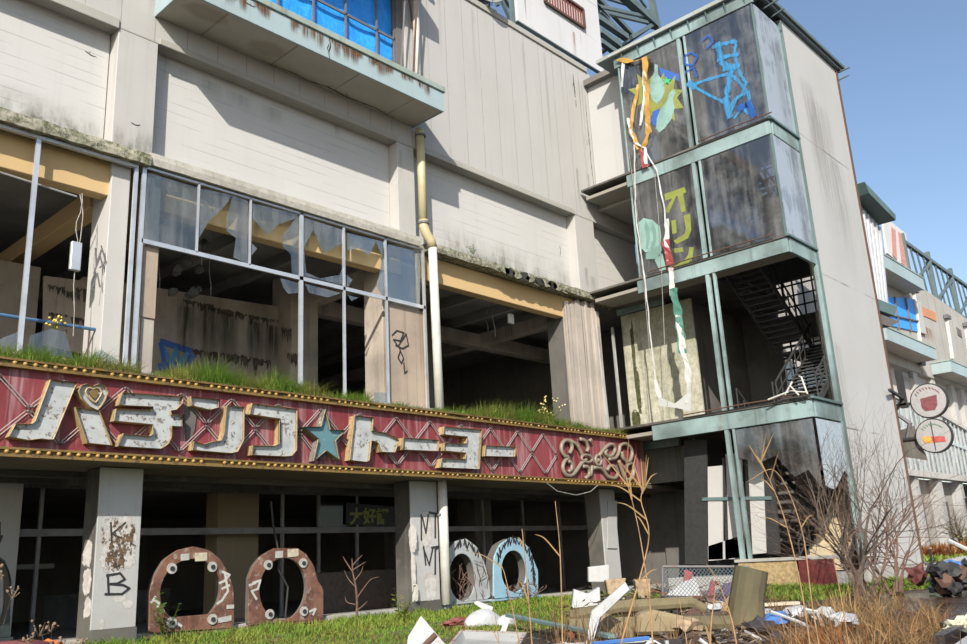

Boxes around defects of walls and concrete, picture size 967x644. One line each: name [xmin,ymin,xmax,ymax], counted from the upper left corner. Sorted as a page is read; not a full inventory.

rust [291,20,429,92]
peeling [82,513,137,618]